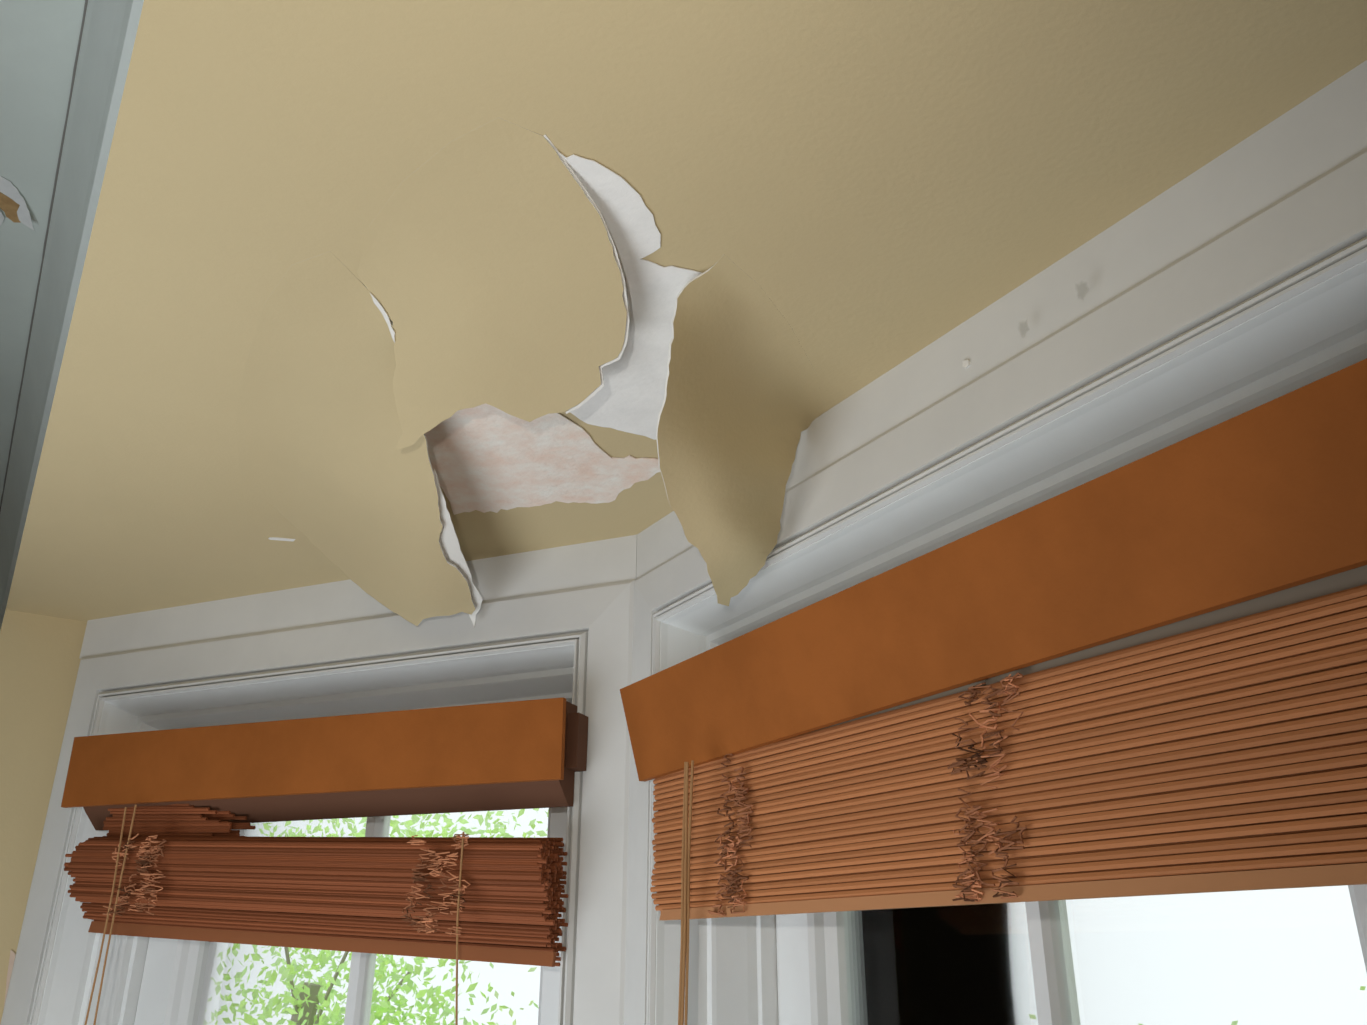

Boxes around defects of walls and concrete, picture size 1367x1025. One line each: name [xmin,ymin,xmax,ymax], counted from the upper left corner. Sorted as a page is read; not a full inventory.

peeling [0,176,35,231]
peeling [235,117,825,628]